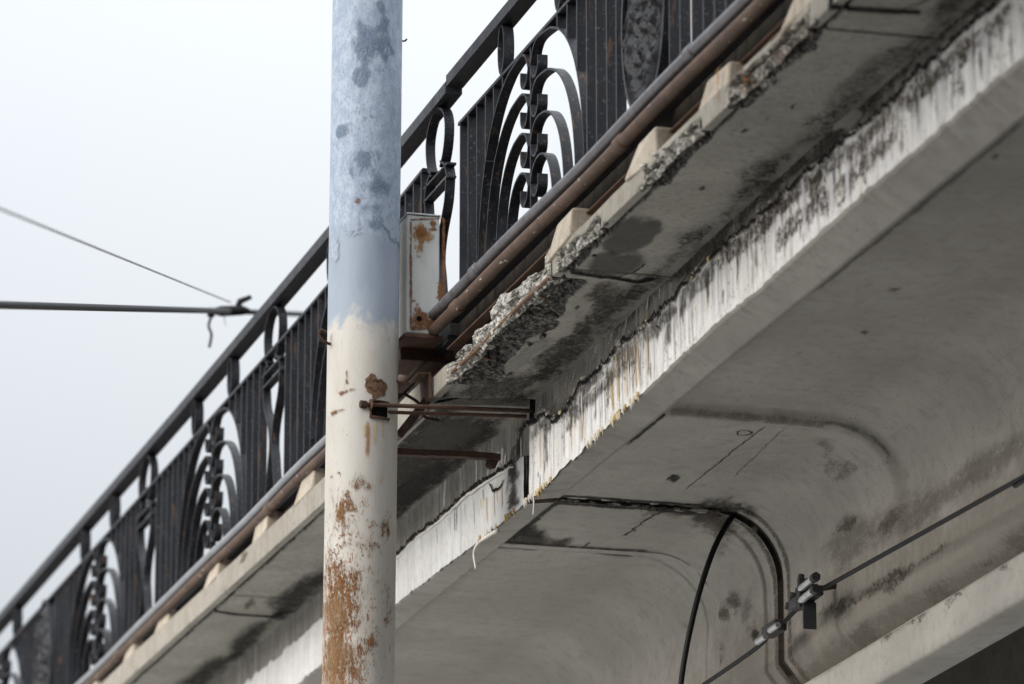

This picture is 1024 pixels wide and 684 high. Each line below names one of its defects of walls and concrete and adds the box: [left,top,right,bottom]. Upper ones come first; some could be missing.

peeling [365,373,387,399]
spalling [446,217,612,386]
leakage [397,177,662,523]
rust [606,336,648,407]
spalling [638,119,714,192]
leakage [476,3,1023,542]
crack [524,0,995,428]
leakage [131,509,325,683]
rust [324,472,390,684]